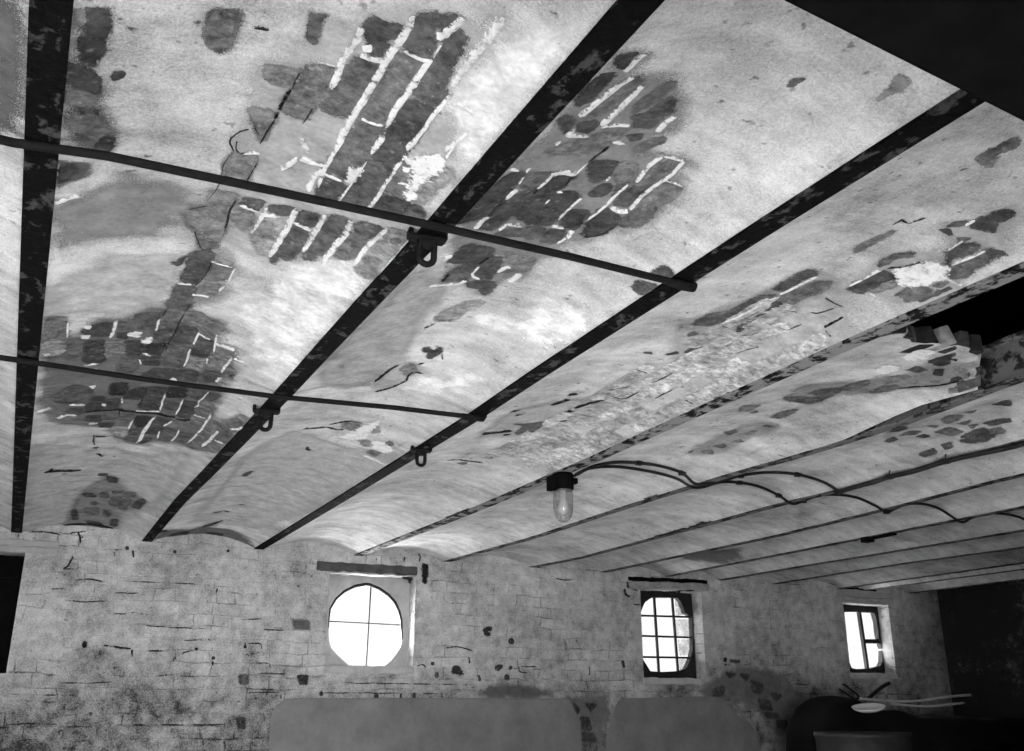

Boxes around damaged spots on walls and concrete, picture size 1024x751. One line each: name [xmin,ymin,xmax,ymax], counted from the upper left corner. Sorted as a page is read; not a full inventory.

crack [162,73,313,352]
peeling [35,0,521,454]
peeling [424,45,704,328]
peeling [475,204,1024,471]
peeling [63,473,153,530]